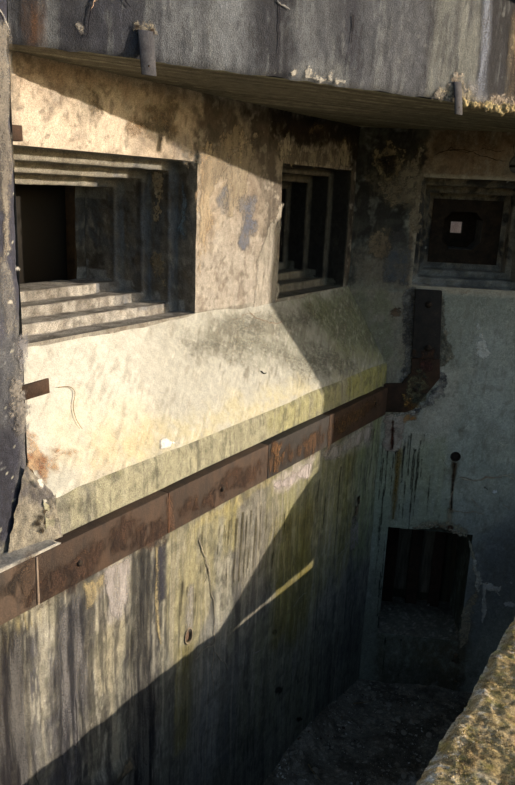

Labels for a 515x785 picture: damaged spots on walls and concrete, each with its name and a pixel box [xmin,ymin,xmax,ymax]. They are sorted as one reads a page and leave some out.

spalling [435,72,515,115]
rust [178,427,331,515]
rust [382,414,417,519]
rust [0,516,168,610]
leakage [219,505,267,582]
leakage [0,628,30,785]
leakage [55,544,166,785]